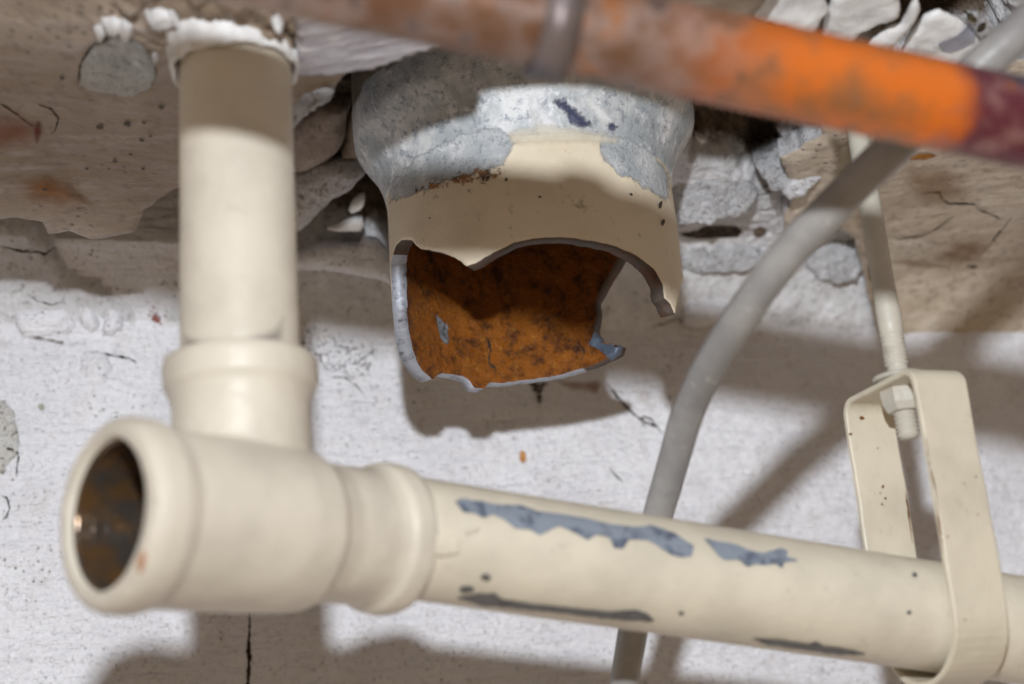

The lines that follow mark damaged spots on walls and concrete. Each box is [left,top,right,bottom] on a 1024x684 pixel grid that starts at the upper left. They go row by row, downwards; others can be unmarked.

peeling [754,0,992,61]
spalling [79,36,156,97]
peeling [291,18,435,129]
crack [0,104,59,134]
peeling [553,99,590,127]
peeling [327,192,365,232]
crack [897,191,1012,255]
spalling [0,400,20,473]
crack [604,381,663,434]
crack [245,613,253,684]